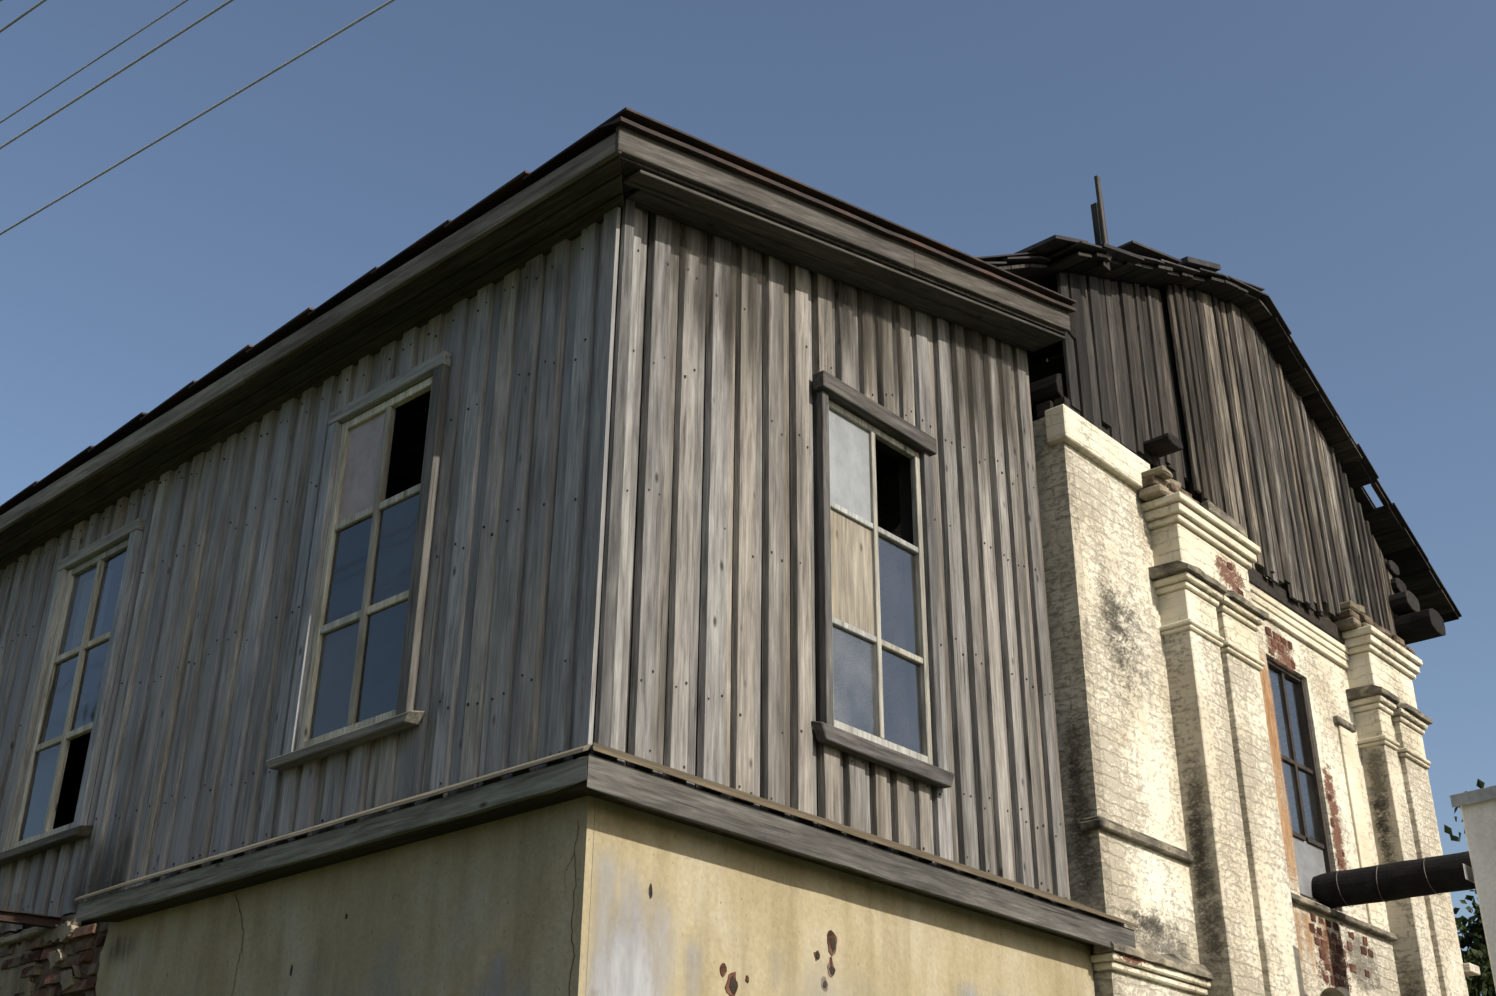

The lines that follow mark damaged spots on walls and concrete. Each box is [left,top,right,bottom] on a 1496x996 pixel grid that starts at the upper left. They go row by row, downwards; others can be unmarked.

spalling [1215,555,1245,596]
spalling [1265,626,1299,672]
spalling [1323,764,1346,870]
damp [1191,773,1219,952]
spalling [0,914,109,996]
crack [564,819,579,994]
damp [1129,911,1184,954]
spalling [1309,913,1379,991]